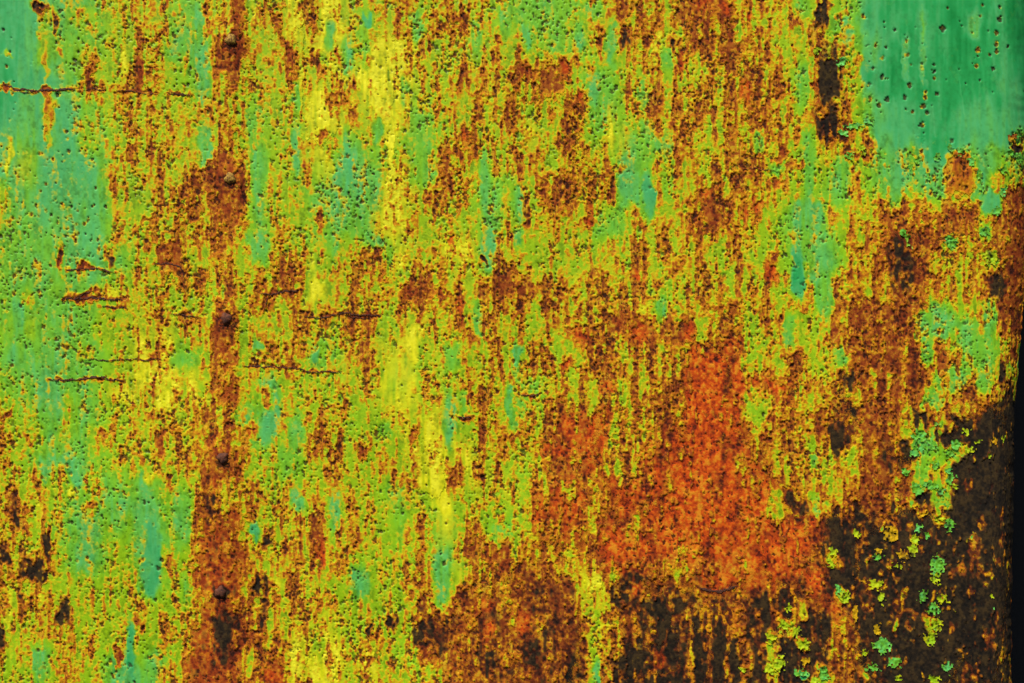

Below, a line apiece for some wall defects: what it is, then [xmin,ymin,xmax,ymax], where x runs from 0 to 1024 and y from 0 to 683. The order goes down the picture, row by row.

crack [3,84,192,96]
crack [63,267,127,309]
crack [47,358,159,382]
rust [142,0,287,683]
crack [305,311,380,319]
rust [763,249,785,287]
rust [457,295,856,683]
peeling [872,420,1006,569]
rust [950,532,1008,576]
peeling [919,555,951,646]
peeling [763,602,831,683]
peeling [862,622,902,681]